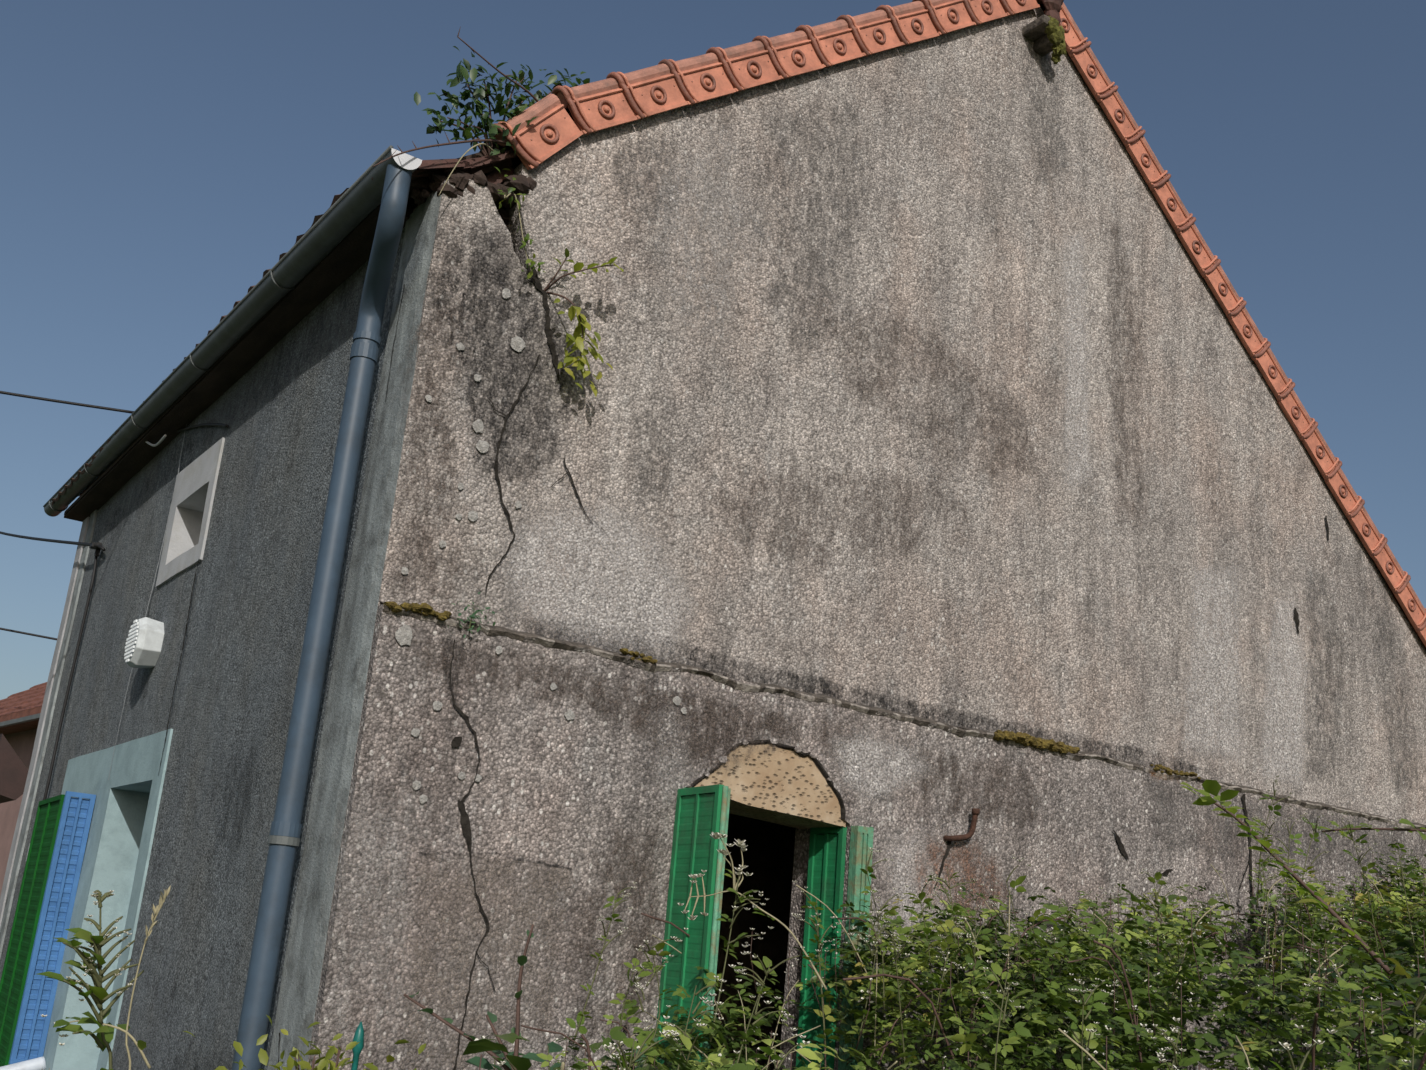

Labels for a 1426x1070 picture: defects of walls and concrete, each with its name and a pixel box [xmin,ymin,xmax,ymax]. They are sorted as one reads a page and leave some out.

water stain [397,228,573,599]
crack [485,266,559,596]
water stain [733,475,916,564]
water stain [772,113,918,401]
water stain [1064,237,1090,487]
crack [449,639,496,1070]
water stain [416,642,796,768]
water stain [525,568,1240,772]
water stain [874,744,1040,822]
rust [917,843,1001,917]